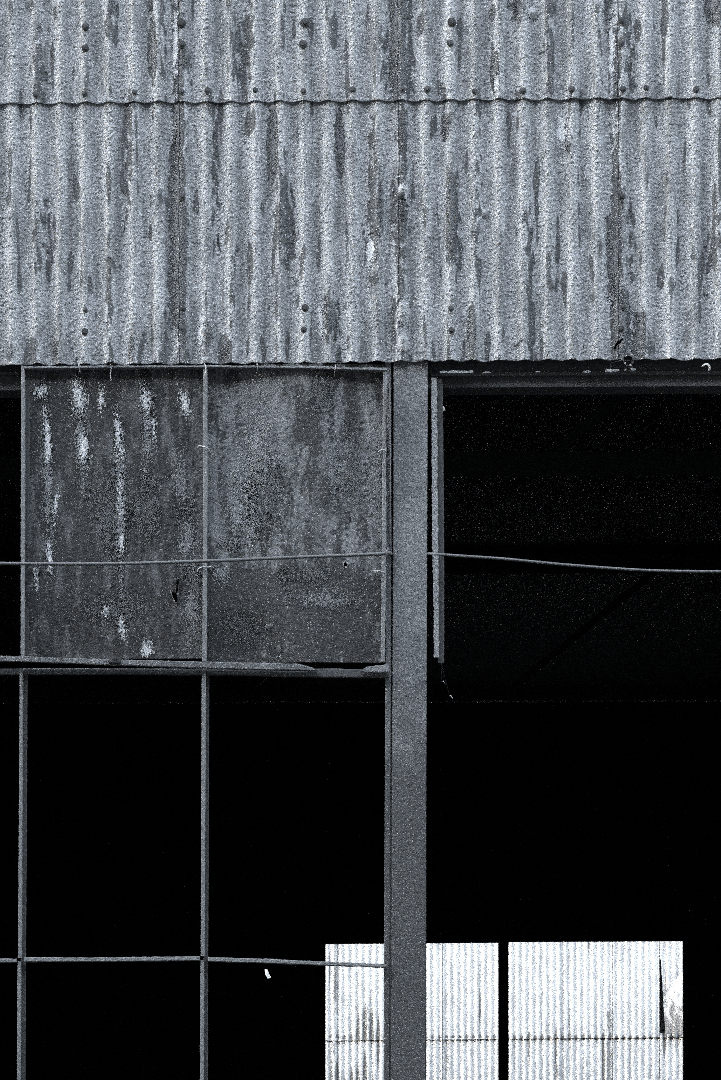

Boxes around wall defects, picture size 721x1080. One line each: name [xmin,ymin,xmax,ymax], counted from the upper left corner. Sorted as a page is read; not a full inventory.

corrosion [89,455,162,567]
corrosion [299,370,363,519]